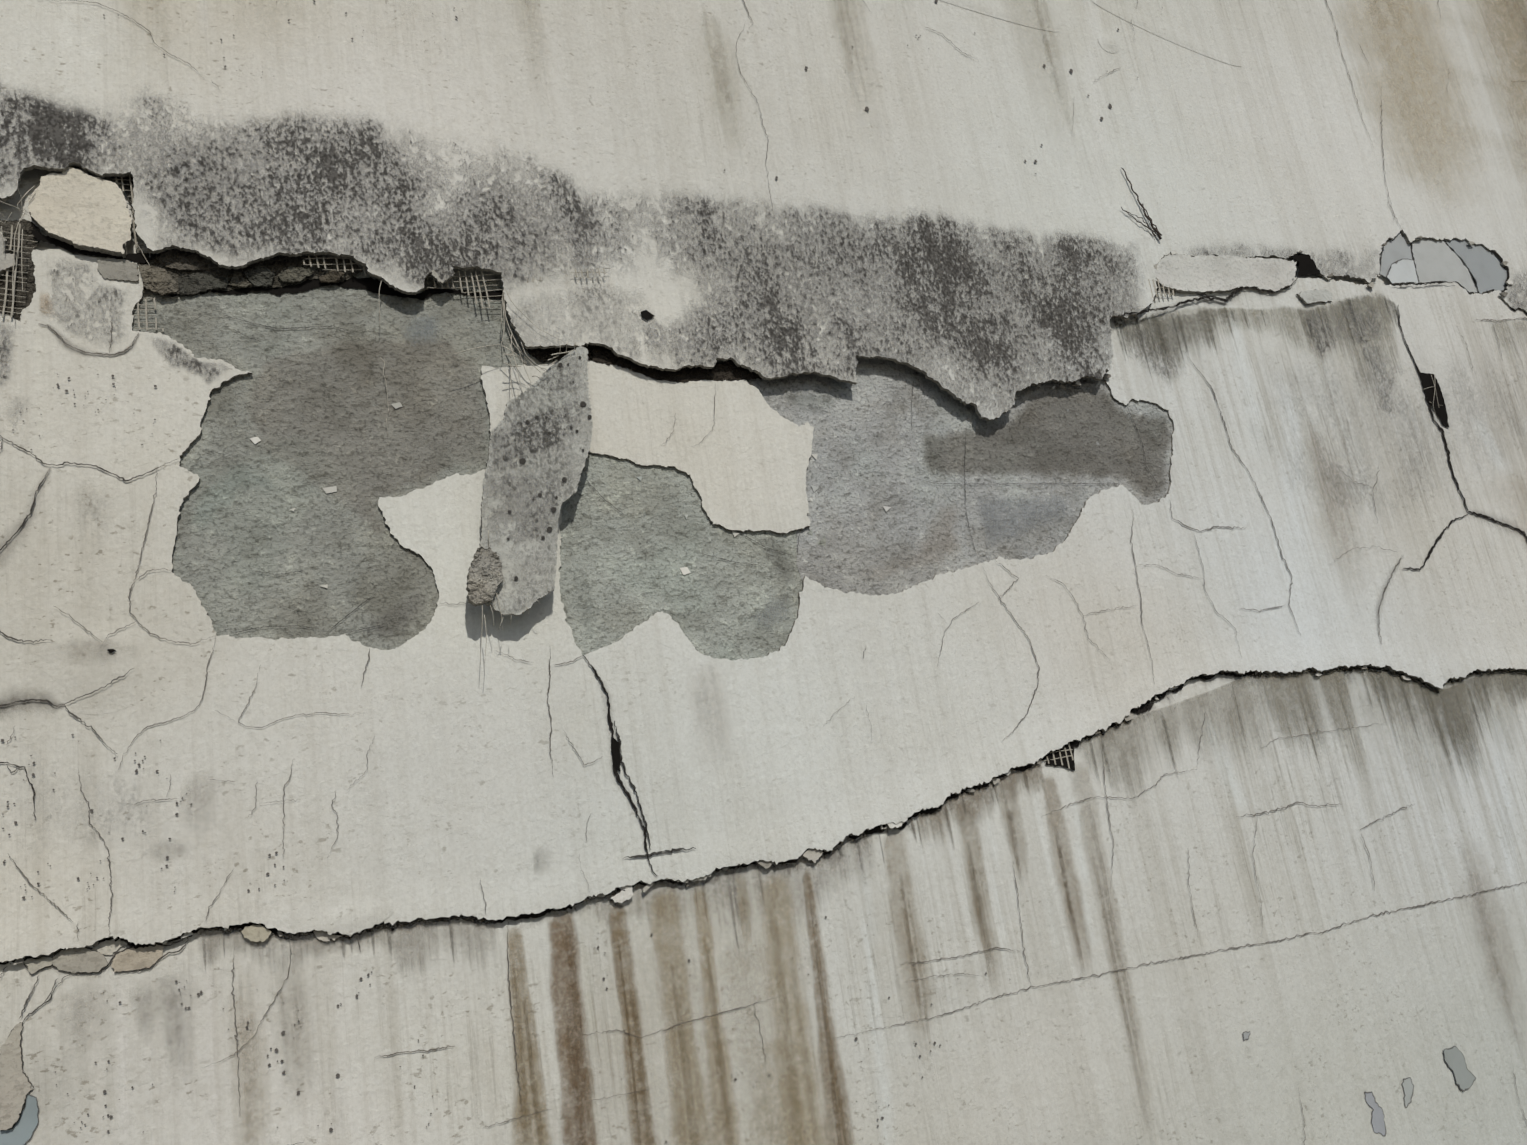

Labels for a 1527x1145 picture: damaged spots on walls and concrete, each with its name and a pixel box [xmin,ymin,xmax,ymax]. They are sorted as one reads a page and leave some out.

spalling [114,175,524,650]
water stain [0,85,1399,415]
spalling [532,358,1173,661]
crack [1014,250,1333,400]
peeling [1380,233,1508,294]
crack [1460,241,1527,371]
crack [0,274,1527,1131]
water stain [1084,670,1348,768]
water stain [1362,667,1527,752]
peeling [0,1022,39,1145]
corrosion [551,919,596,1145]
corrosion [613,912,654,1145]